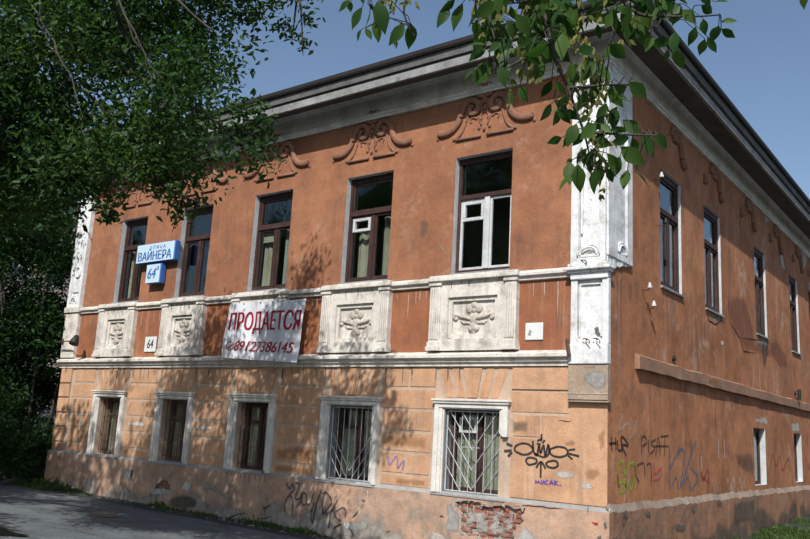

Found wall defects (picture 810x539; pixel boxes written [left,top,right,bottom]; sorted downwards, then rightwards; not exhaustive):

flaking render [104,470,248,521]
flaking render [455,499,536,539]